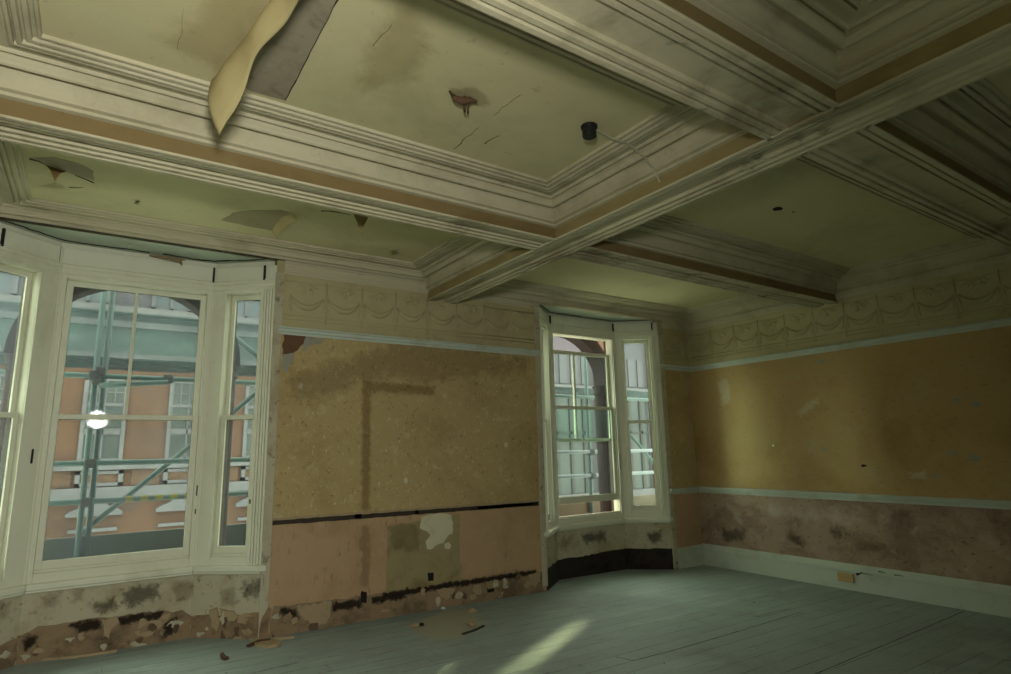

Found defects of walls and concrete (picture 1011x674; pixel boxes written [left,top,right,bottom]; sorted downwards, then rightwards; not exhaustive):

peeling [321,210,368,233]
peeling [282,335,325,372]
leakage [746,488,889,547]
peeling [436,578,509,607]
leakage [69,619,101,633]
peeling [65,616,120,651]
leakage [118,610,178,637]
peeling [130,612,184,647]
peeling [196,600,332,639]